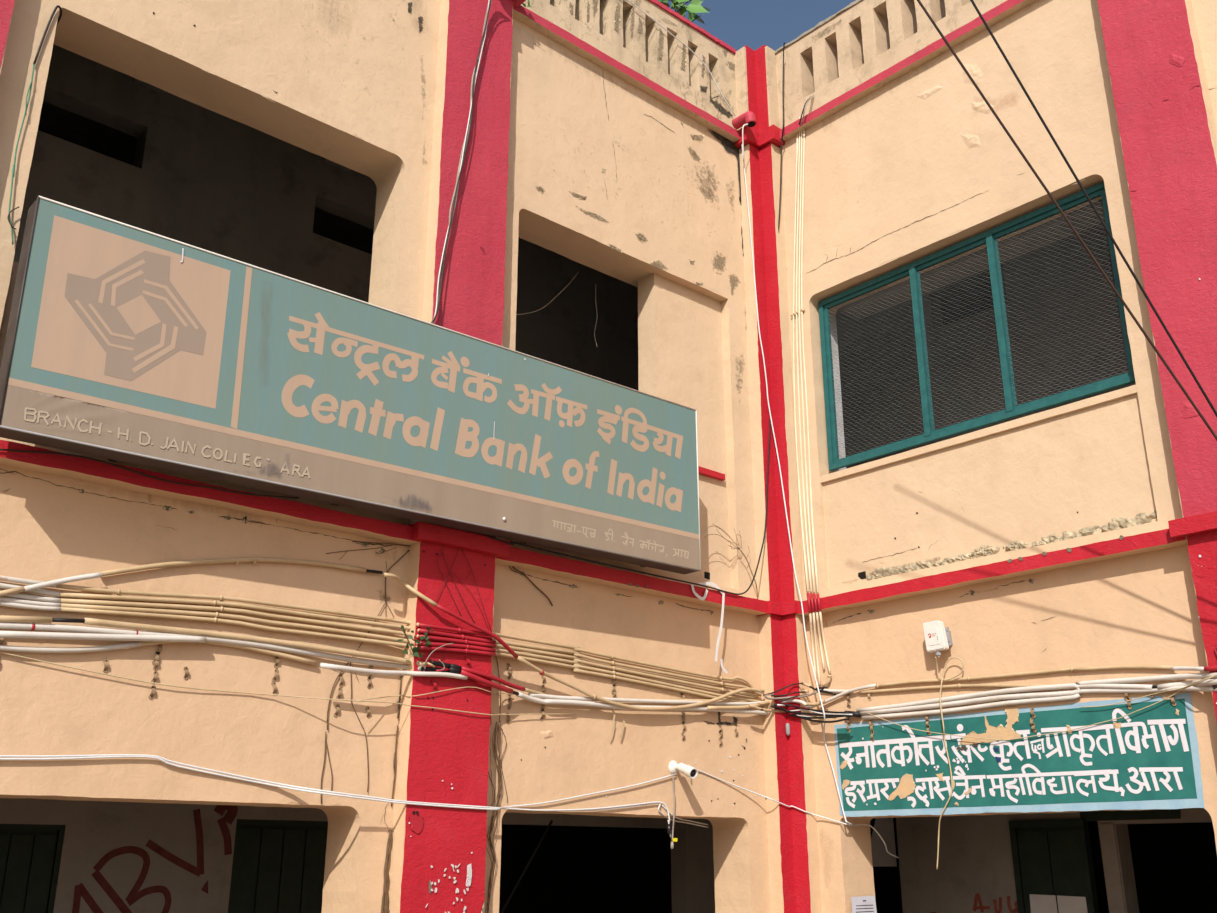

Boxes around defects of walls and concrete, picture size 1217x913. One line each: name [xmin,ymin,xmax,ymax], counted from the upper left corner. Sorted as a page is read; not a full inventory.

spalling [681,123,704,162]
spalling [571,192,608,223]
crack [807,190,1010,273]
spalling [712,251,741,295]
spalling [858,510,1157,581]